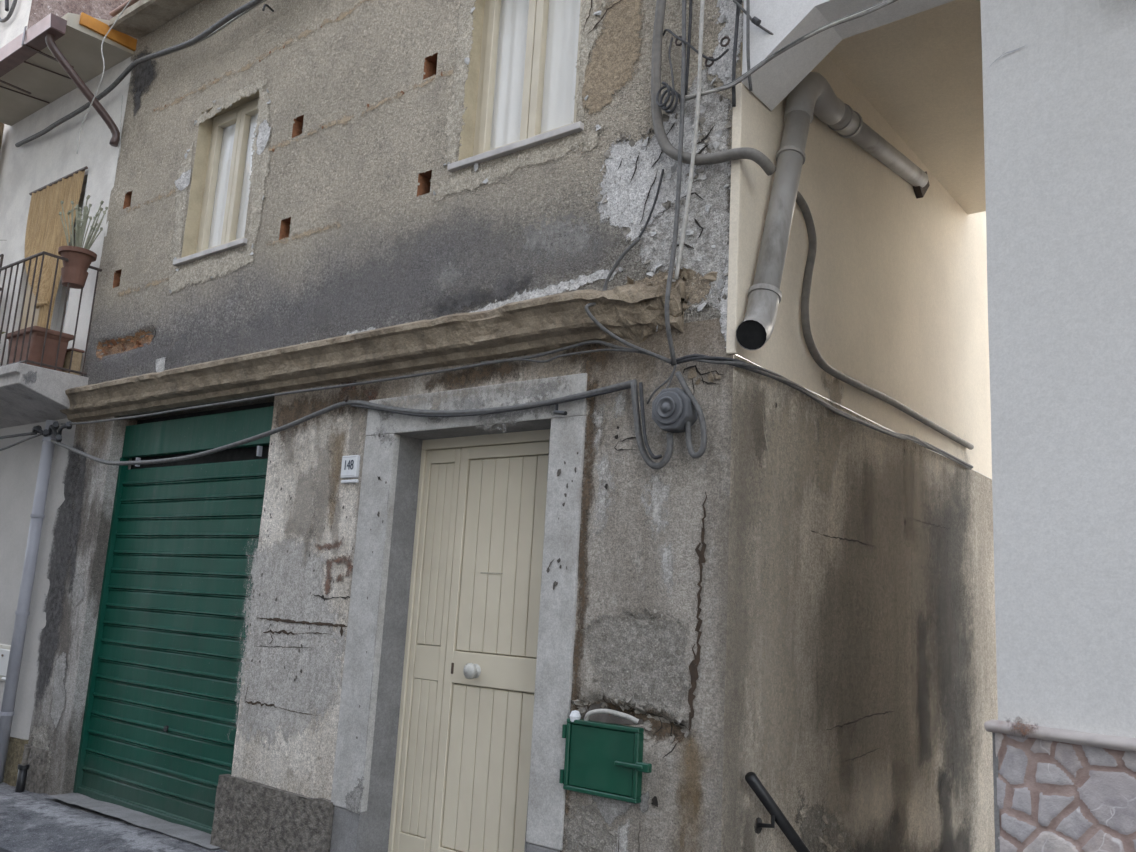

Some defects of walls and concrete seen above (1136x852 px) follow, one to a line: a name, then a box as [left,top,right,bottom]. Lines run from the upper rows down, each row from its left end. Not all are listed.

flaking render [96,325,156,360]
flaking render [468,0,744,349]
crack [646,492,707,758]
water stain [755,408,846,785]
water stain [854,474,974,852]